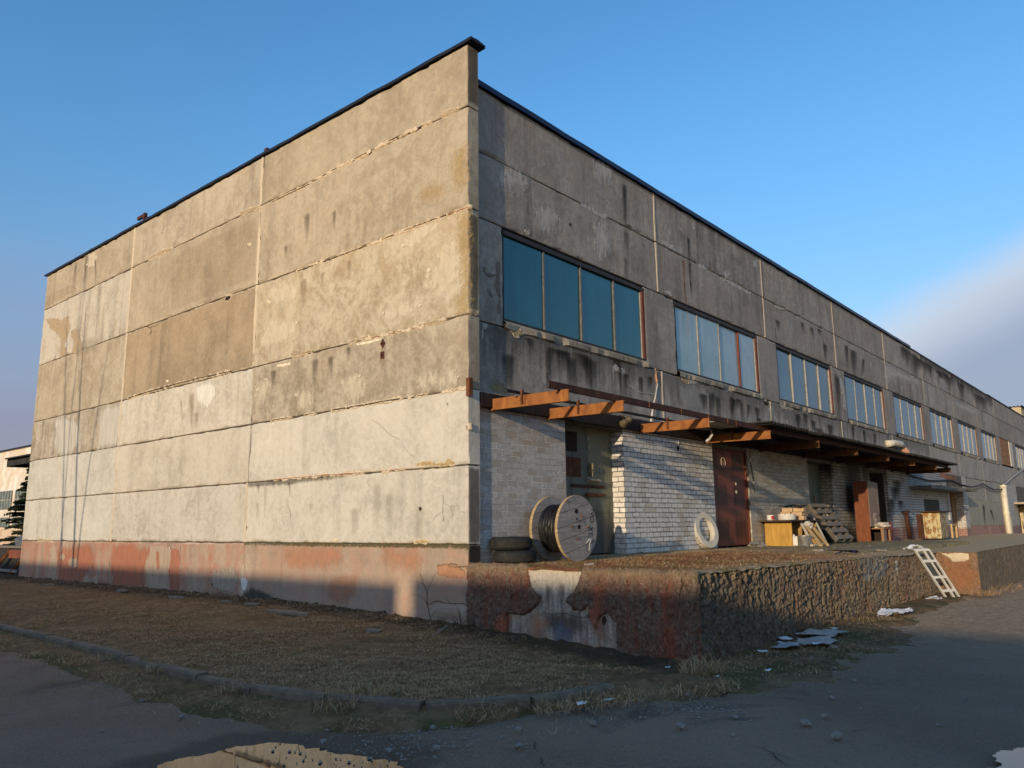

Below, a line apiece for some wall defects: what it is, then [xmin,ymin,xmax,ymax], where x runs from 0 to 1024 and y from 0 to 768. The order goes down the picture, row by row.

peeling [399,223,437,248]
peeling [260,319,298,348]
spalling [347,335,383,345]
damp [901,347,964,391]
peeling [341,372,368,408]
peeling [38,538,98,584]
peeling [110,544,180,591]
peeling [210,567,238,593]
spalling [509,571,617,649]